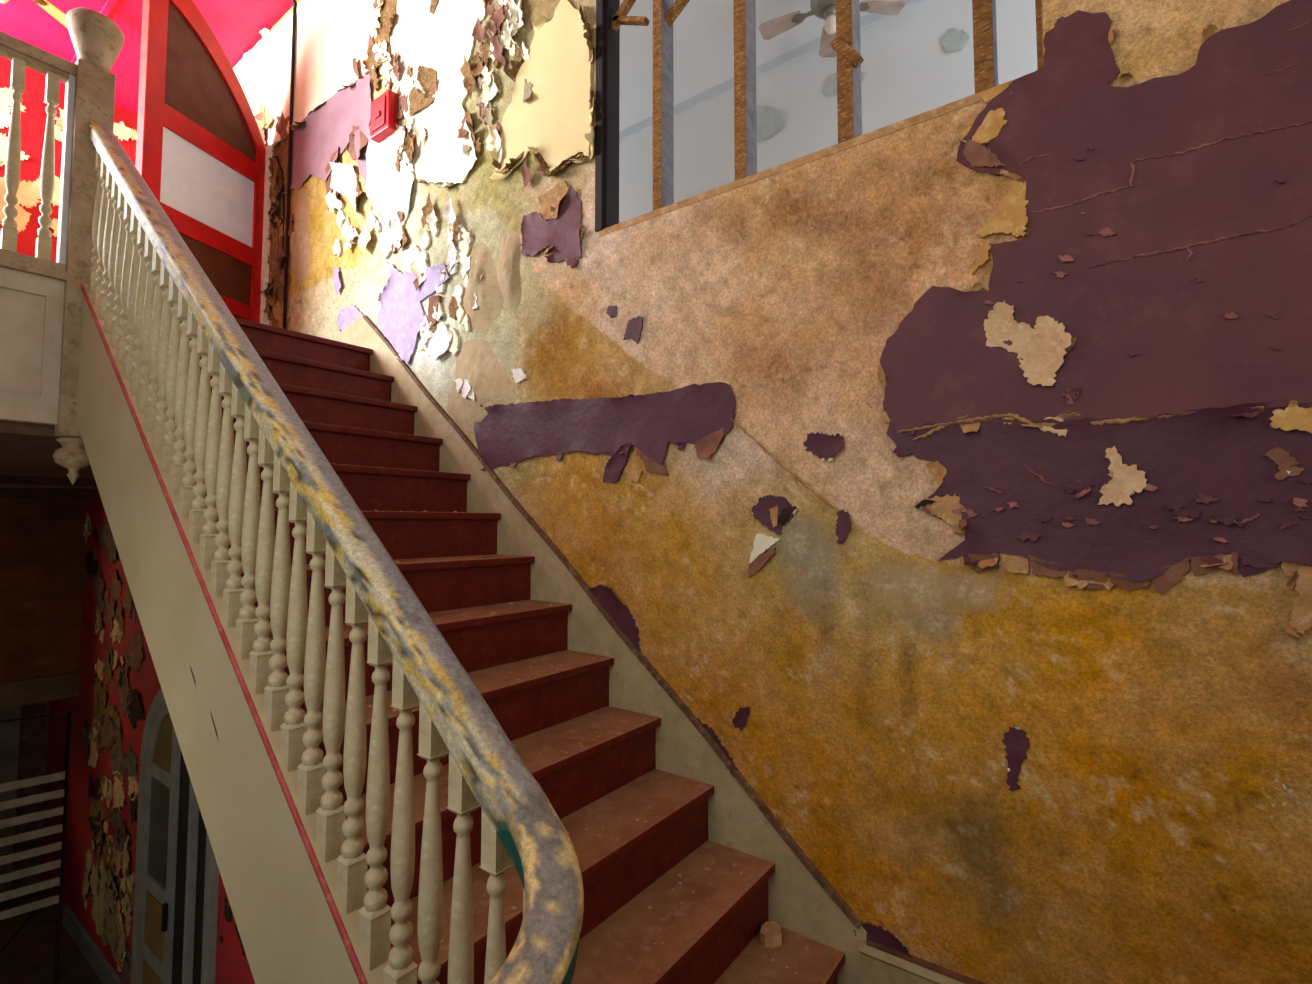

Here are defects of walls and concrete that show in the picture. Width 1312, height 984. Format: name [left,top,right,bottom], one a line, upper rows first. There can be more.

peeling [0,87,61,237]
peeling [55,108,64,142]
peeling [113,121,137,141]
peeling [233,0,594,365]
peeling [823,73,837,97]
peeling [877,0,1312,640]
peeling [511,368,527,384]
peeling [454,378,735,483]
peeling [747,495,798,578]
peeling [835,509,852,544]
peeling [82,512,146,983]
peeling [1002,727,1030,791]